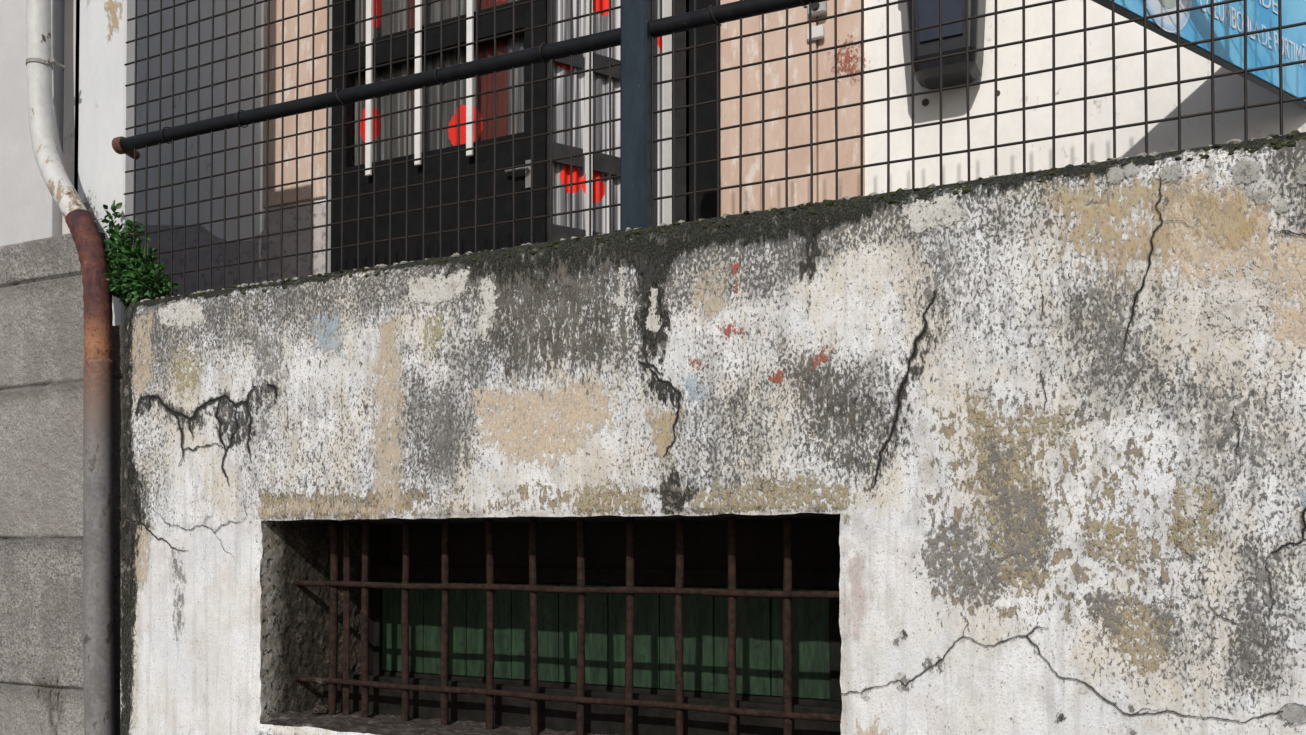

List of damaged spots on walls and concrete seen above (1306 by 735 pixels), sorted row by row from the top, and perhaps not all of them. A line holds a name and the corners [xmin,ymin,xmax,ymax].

water stain [463,242,680,405]
water stain [796,216,825,312]
water stain [913,217,985,343]
crack [1121,176,1195,359]
spalling [1153,172,1306,358]
crack [118,378,281,556]
peeling [469,373,619,469]
crack [638,360,684,459]
crack [858,289,949,497]
crack [1207,506,1306,624]
crack [840,614,1283,723]